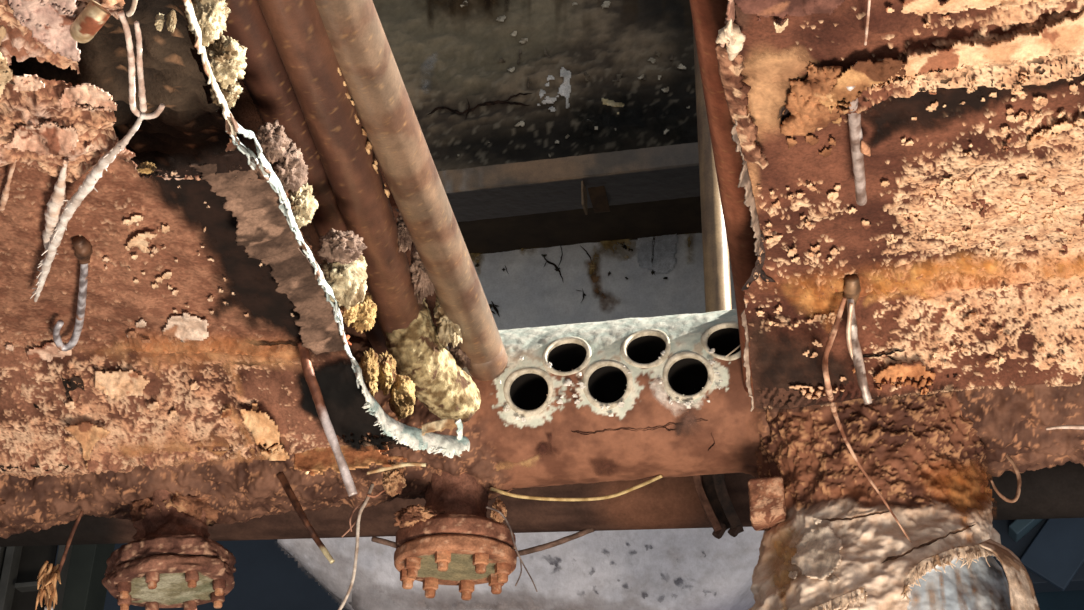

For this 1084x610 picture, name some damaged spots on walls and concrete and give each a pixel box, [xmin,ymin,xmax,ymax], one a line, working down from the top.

crack [428,93,532,120]
peeling [911,87,946,120]
peeling [989,72,1048,153]
peeling [757,182,841,209]
peeling [764,222,840,263]
corrosion [874,258,997,297]
corrosion [801,281,843,315]
peeling [756,304,836,330]
corrosion [537,434,556,455]
crack [576,419,715,451]
crack [0,464,69,472]
corrosion [592,461,615,474]